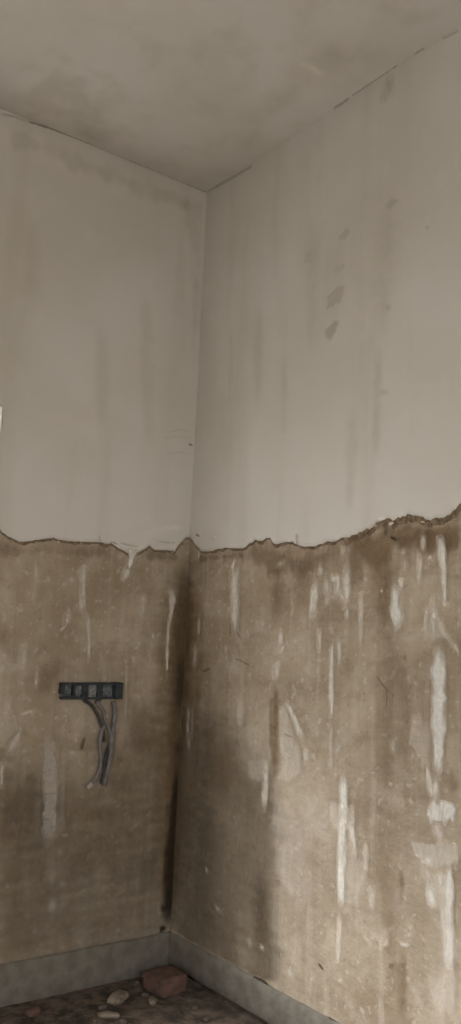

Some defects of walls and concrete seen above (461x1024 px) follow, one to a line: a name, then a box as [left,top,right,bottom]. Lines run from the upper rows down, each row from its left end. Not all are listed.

efflorescence [123,549,138,580]
efflorescence [311,572,350,618]
efflorescence [329,643,340,713]
flaking render [0,503,461,1024]
leakage [160,593,302,979]
efflorescence [338,782,355,901]
efflorescence [427,655,455,822]
efflorescence [428,872,452,963]